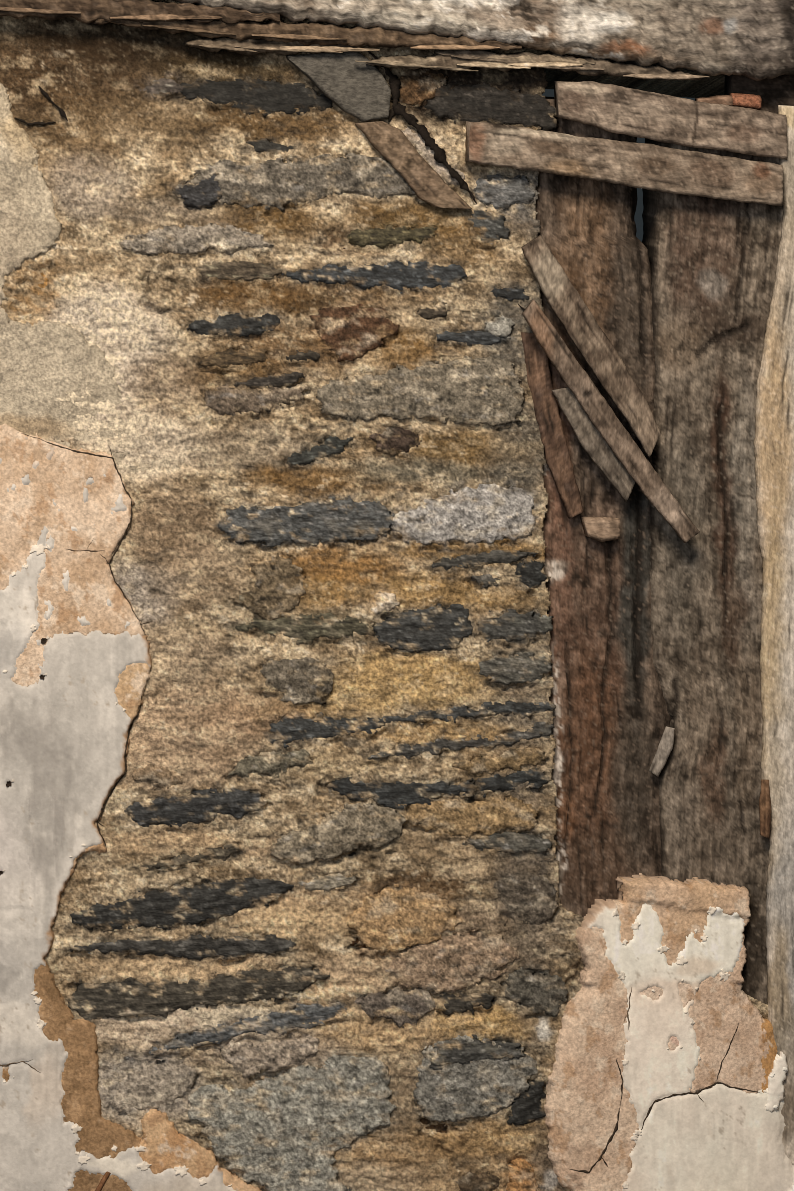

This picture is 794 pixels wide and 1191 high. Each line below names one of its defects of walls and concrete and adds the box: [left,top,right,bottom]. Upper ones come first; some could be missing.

peeling [114,663,151,720]
peeling [70,843,107,876]
peeling [31,962,262,1191]
peeling [544,926,663,1191]
crack [624,988,632,1029]
crack [570,1023,757,1174]
peeling [612,875,778,1093]